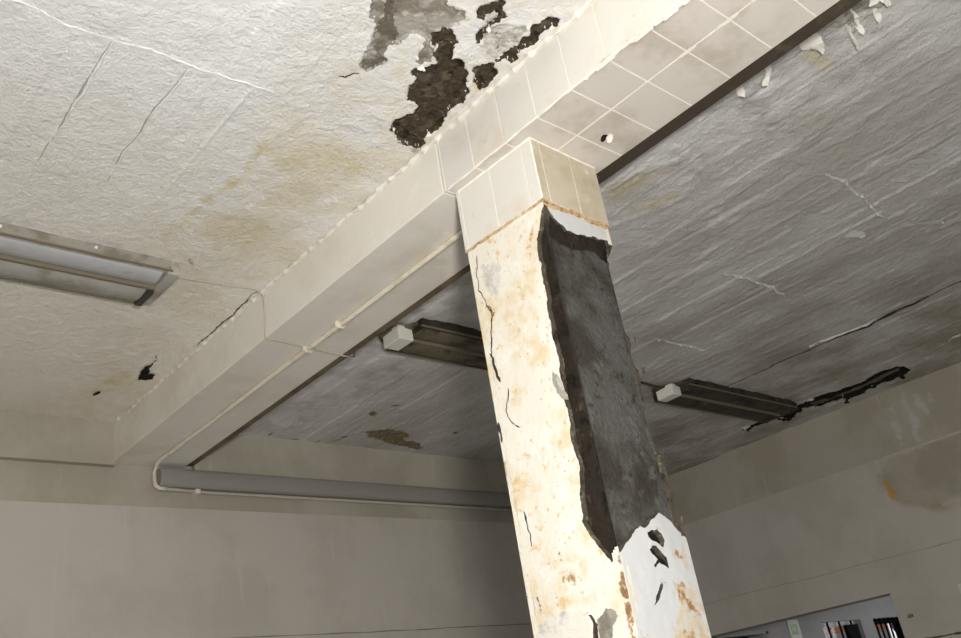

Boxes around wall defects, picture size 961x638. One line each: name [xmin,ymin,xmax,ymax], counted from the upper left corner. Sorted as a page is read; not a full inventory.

crack [37,41,114,162]
crack [107,68,190,181]
damp [0,82,418,277]
spalling [359,0,560,149]
corrosion [523,216,540,266]
crack [476,256,520,443]
spalling [541,215,683,567]
spalling [742,366,911,432]
crack [729,281,961,386]
damp [870,387,961,521]
peeling [537,608,618,638]
corrosion [532,533,711,638]